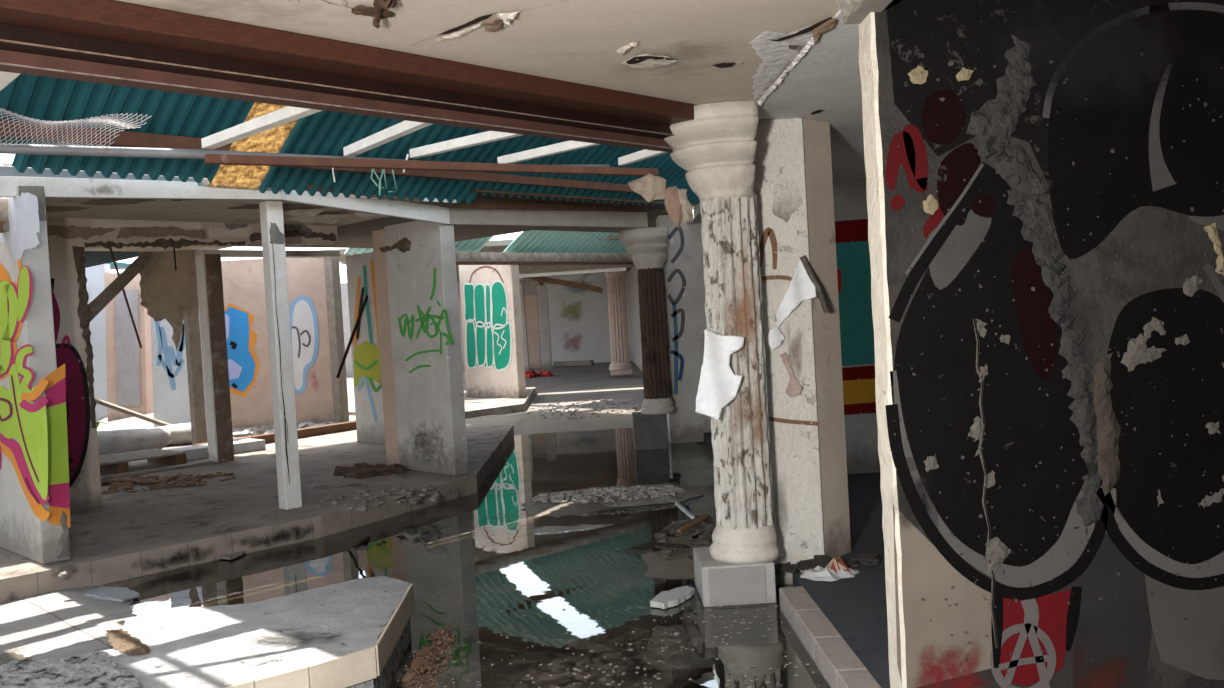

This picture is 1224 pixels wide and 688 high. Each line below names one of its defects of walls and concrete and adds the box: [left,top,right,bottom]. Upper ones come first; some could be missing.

peeling [1183,272,1212,297]
peeling [0,186,390,428]
peeling [1086,309,1190,372]
peeling [1202,415,1221,435]
peeling [1198,475,1224,508]